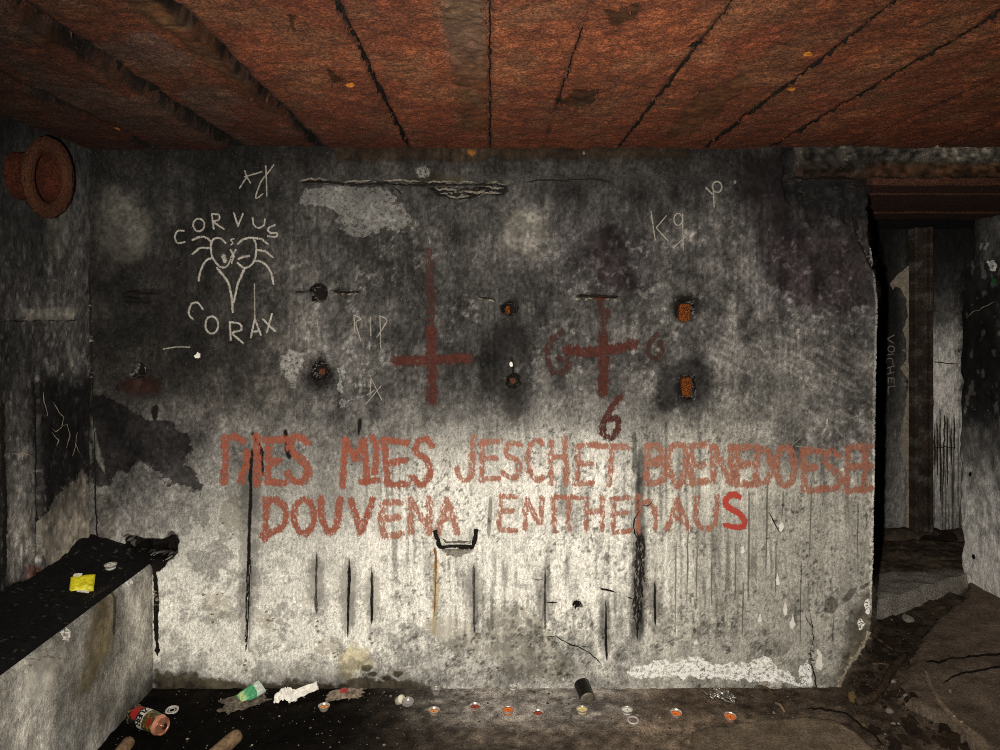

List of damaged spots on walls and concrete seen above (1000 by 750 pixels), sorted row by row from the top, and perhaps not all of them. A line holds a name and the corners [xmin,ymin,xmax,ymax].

peeling [300,184,413,238]
crack [299,177,504,196]
leakage [629,433,663,641]
leakage [627,656,813,687]
crack [803,613,883,745]